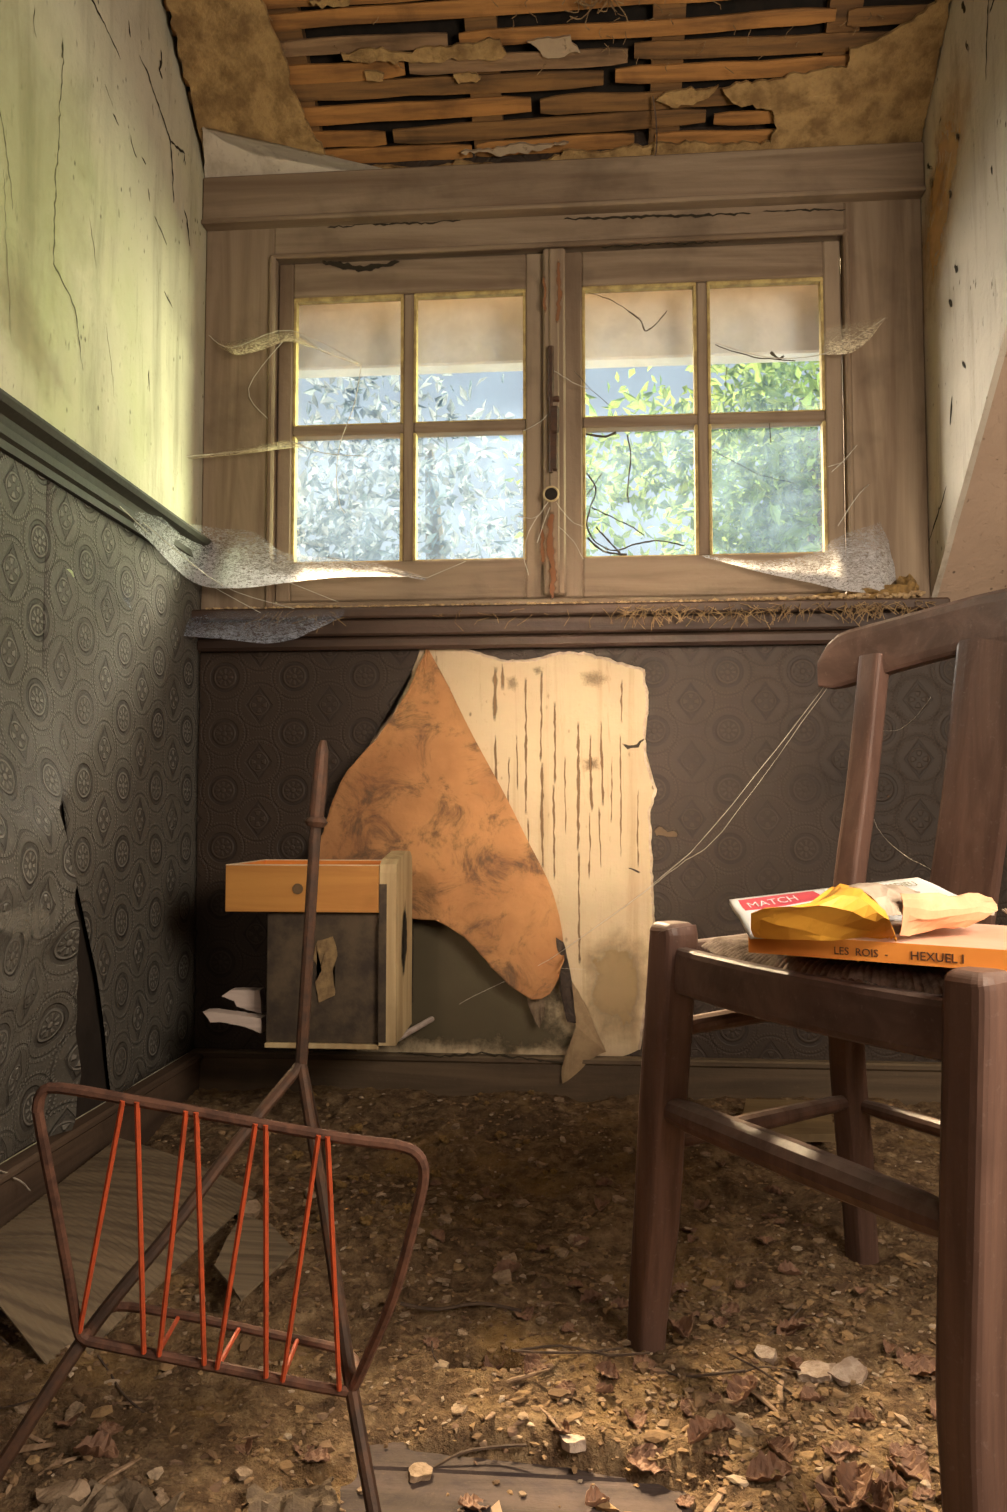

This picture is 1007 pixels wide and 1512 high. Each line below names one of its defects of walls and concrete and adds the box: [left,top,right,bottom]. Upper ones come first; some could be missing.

crack [0,112,13,332]
crack [33,10,150,391]
crack [91,0,190,245]
spalling [164,0,966,178]